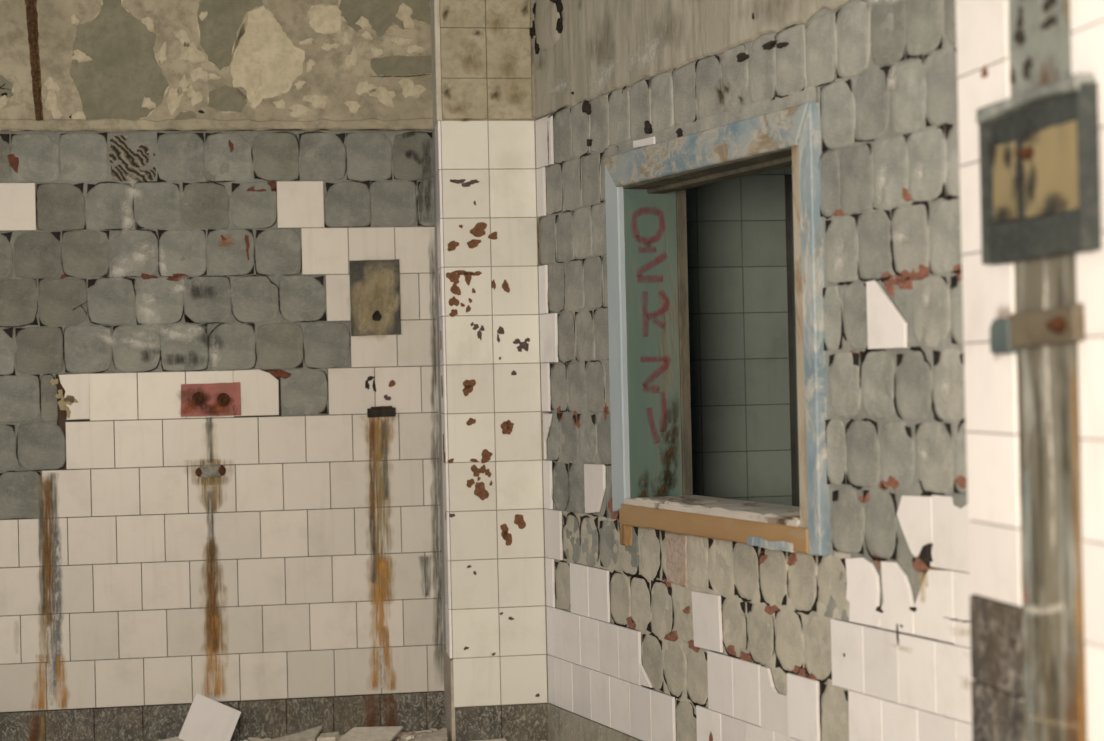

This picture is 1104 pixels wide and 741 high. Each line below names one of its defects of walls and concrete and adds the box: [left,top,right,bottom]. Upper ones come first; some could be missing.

spalling [1008,0,1074,97]
spalling [0,0,434,520]
spalling [539,0,970,741]
rust [30,475,67,741]
rust [183,396,225,696]
rust [367,417,395,727]